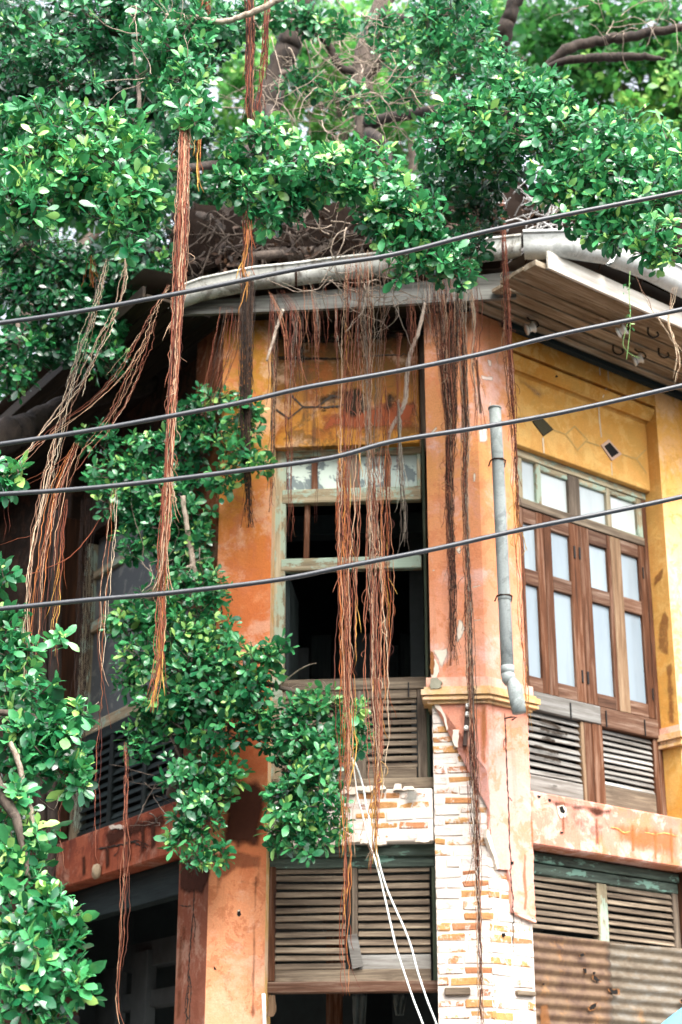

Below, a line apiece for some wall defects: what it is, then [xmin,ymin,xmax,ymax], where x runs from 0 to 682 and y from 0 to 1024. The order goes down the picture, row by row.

peeling [323,388,415,430]
flaking render [318,704,536,1024]
rust [619,826,673,862]